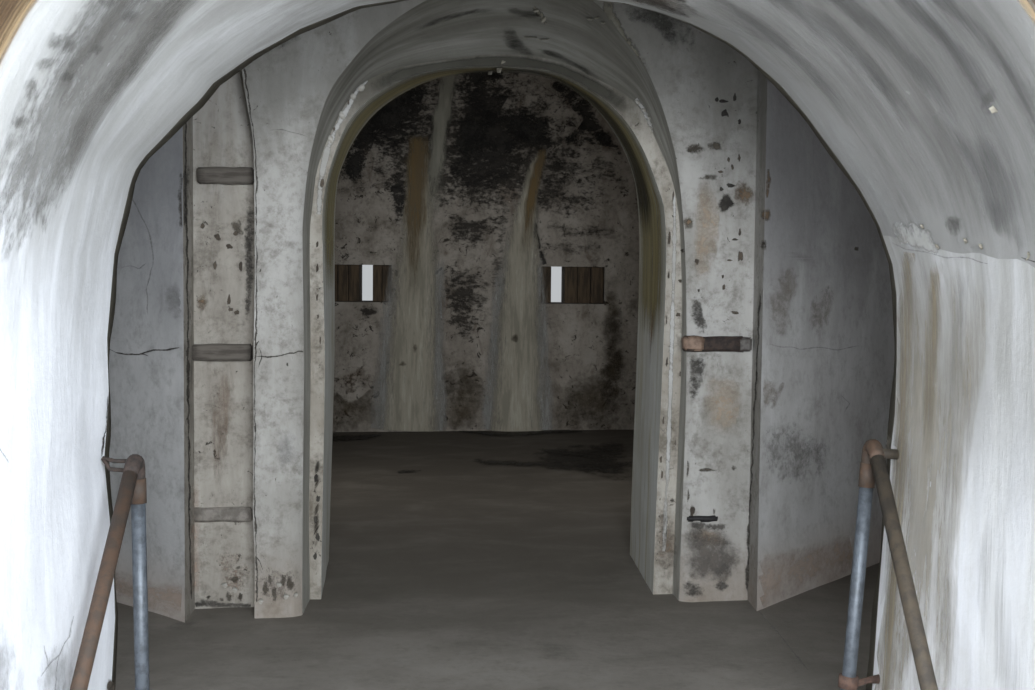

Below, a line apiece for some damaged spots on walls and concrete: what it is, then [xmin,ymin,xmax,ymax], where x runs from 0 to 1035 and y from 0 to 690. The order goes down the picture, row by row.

damp [1,0,175,222]
damp [332,31,625,442]
crack [100,400,108,454]
crack [112,123,192,599]
damp [685,523,734,596]